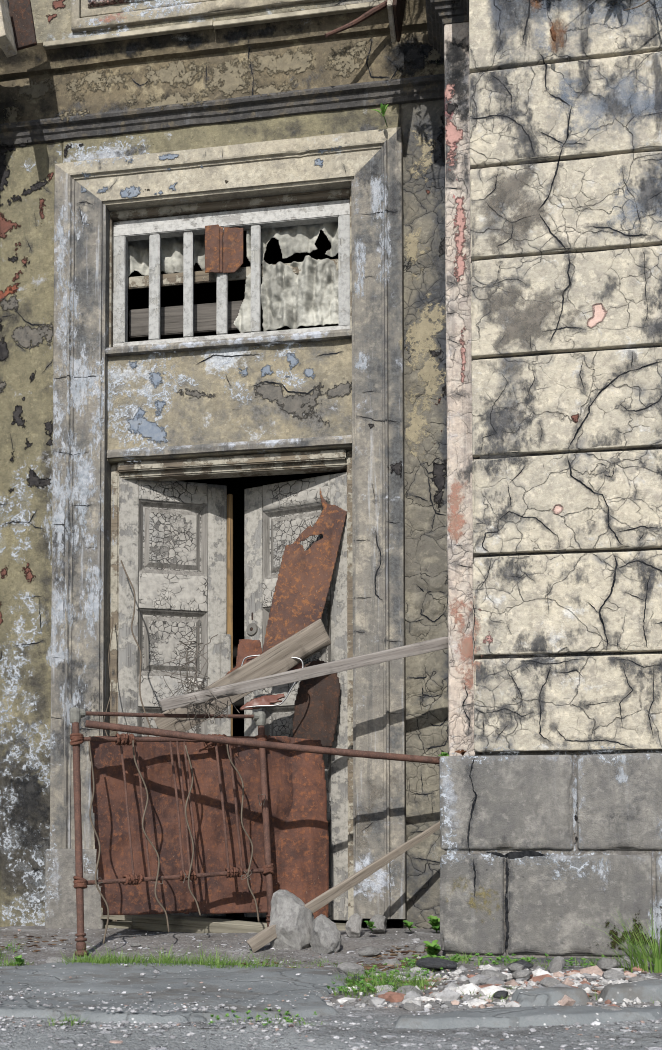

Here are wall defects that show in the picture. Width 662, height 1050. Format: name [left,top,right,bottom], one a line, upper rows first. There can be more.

spalling [0,140,54,361]
water stain [410,38,544,251]
crack [447,0,590,449]
water stain [562,13,662,128]
crack [590,159,661,321]
spalling [10,397,32,461]
spalling [26,468,51,488]
water stain [0,203,198,926]
spalling [254,352,352,426]
peeling [431,459,465,540]
water stain [458,362,534,482]
crack [389,352,662,954]